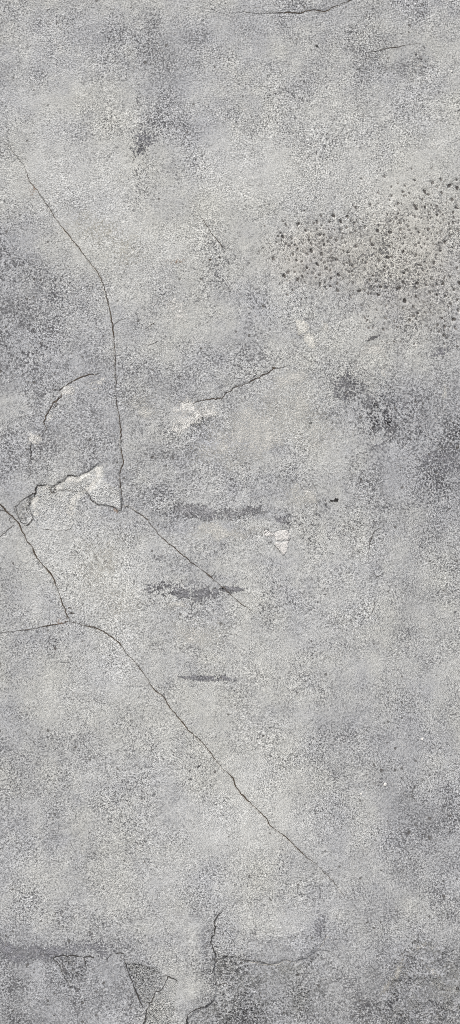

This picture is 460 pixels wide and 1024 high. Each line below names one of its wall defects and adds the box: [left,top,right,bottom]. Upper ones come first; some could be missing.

crack [230,0,350,14]
crack [3,142,259,617]
crack [181,364,291,403]
crack [0,504,343,895]